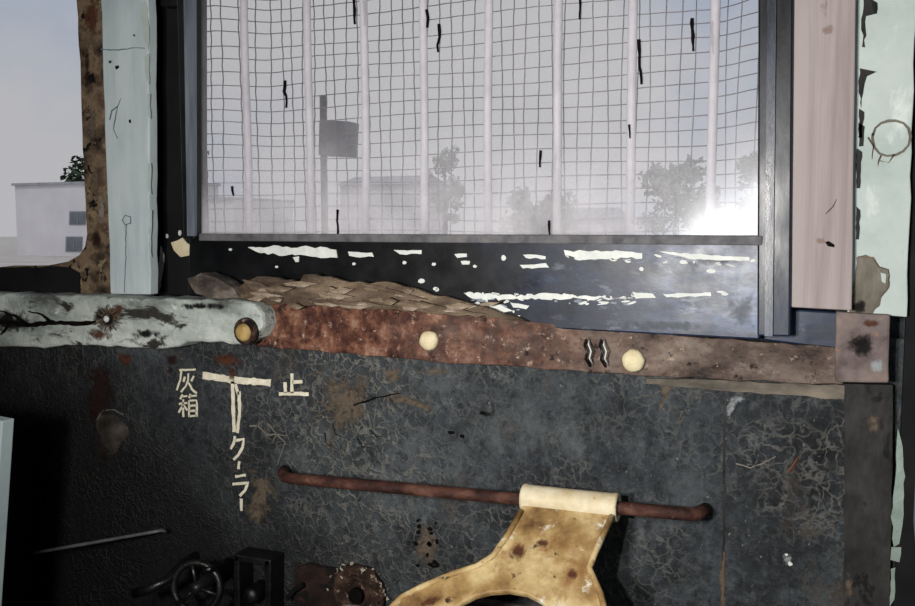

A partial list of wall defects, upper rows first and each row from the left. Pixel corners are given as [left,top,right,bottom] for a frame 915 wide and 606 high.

peeling [861,0,878,47]
peeling [856,68,875,188]
peeling [248,245,338,268]
peeling [348,251,374,265]
peeling [394,250,422,264]
peeling [520,254,549,269]
peeling [564,250,756,273]
peeling [849,255,890,313]
peeling [465,291,728,316]
crack [0,310,96,335]